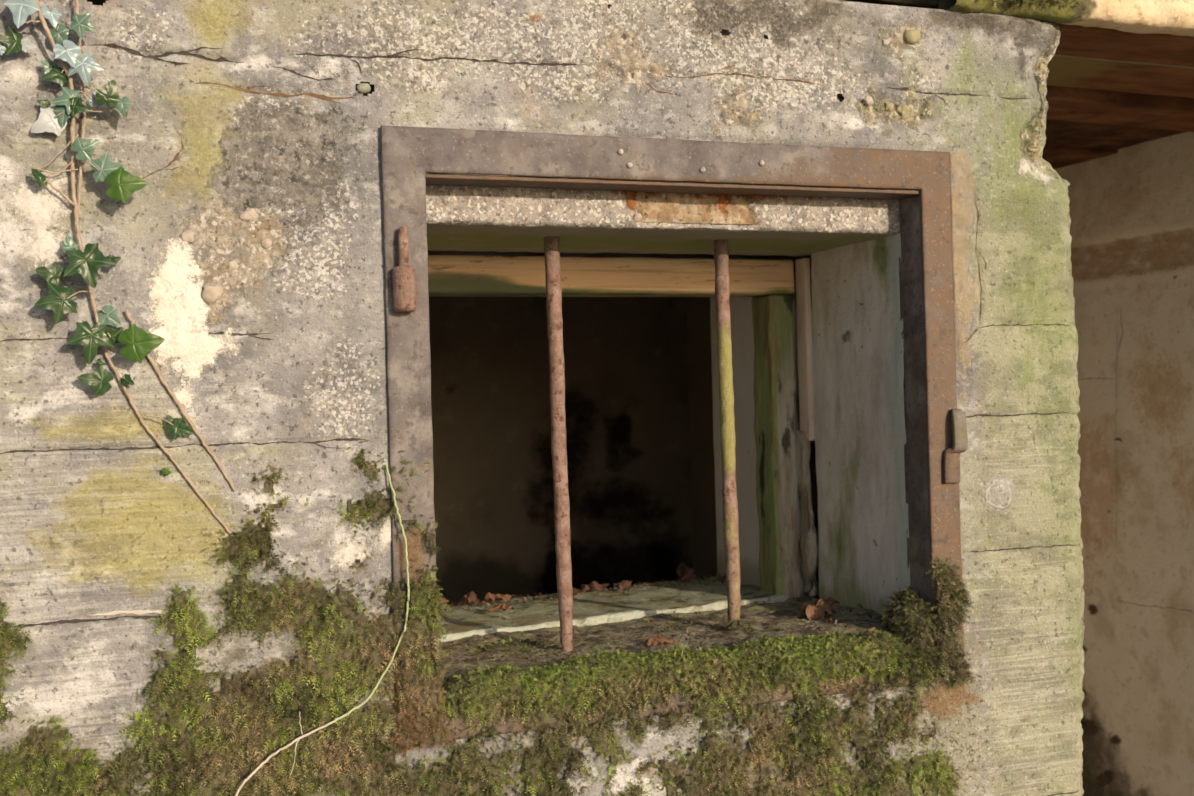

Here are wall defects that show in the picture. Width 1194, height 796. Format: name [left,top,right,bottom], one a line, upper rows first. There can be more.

crack [94,43,591,104]
corrosion [614,190,655,210]
corrosion [689,182,790,212]
spalling [146,102,356,410]
crack [0,336,70,344]
crack [208,332,273,340]
crack [0,438,370,454]
water stain [565,393,673,533]
water stain [528,435,558,595]
water stain [571,545,677,590]